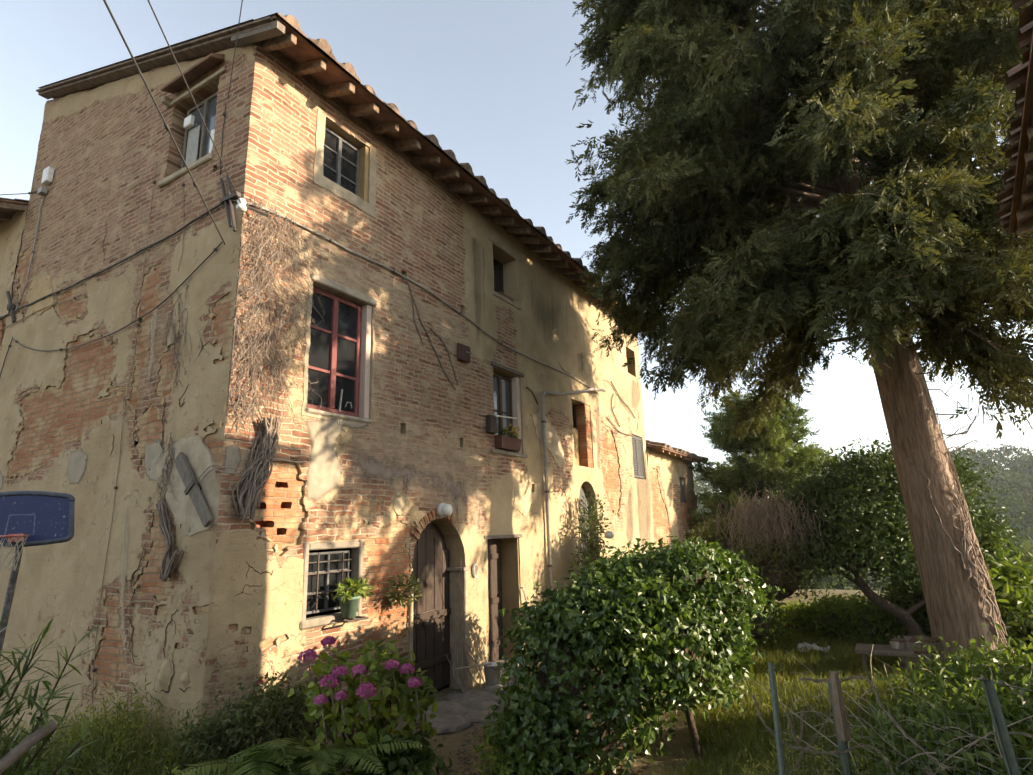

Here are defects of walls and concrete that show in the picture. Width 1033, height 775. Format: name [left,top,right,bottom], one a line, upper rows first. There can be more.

flaking render [9,329,127,479]
flaking render [205,421,225,469]
flaking render [601,431,621,517]
flaking render [133,499,190,606]